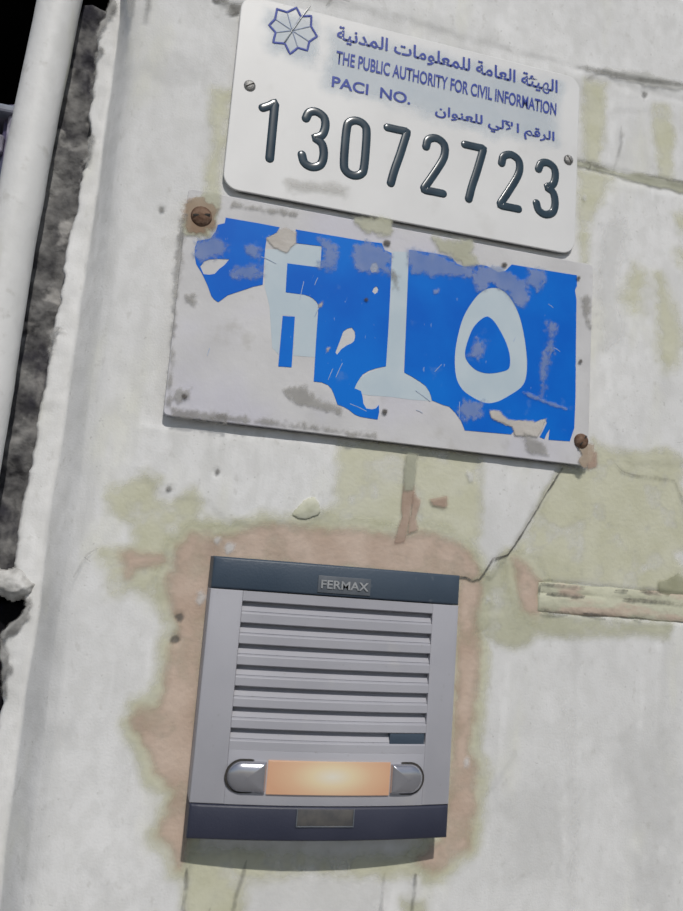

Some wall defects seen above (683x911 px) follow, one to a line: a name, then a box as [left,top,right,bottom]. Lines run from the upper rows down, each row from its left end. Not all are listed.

crack [460,468,563,582]
spalling [0,598,31,697]
peeling [101,443,683,911]